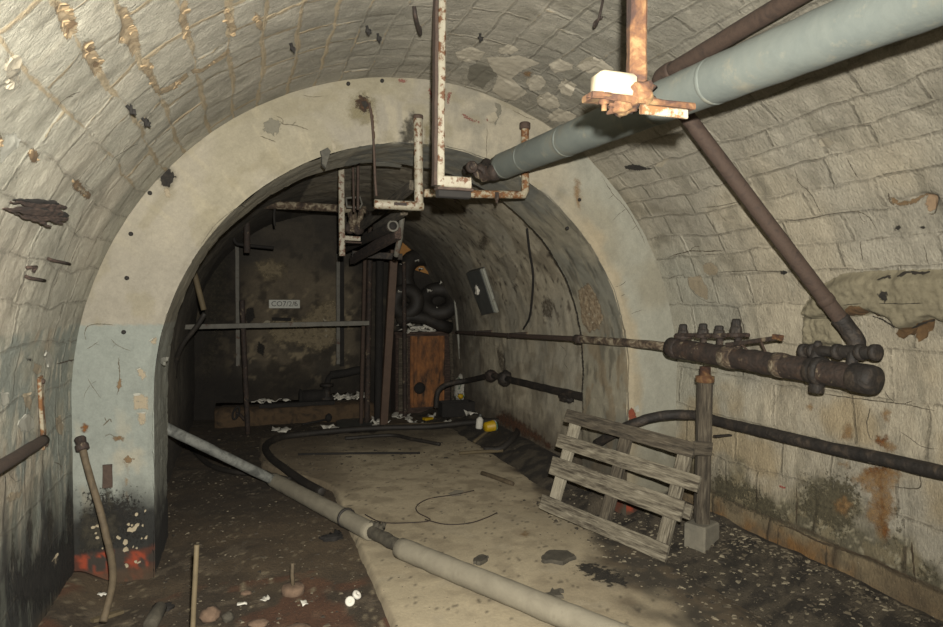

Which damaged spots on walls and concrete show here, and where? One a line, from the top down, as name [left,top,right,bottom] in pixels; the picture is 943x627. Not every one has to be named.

corrosion [352,95,375,137]
spalling [888,193,939,215]
leakage [712,466,867,540]
corrosion [857,466,898,538]
leakage [6,485,148,616]